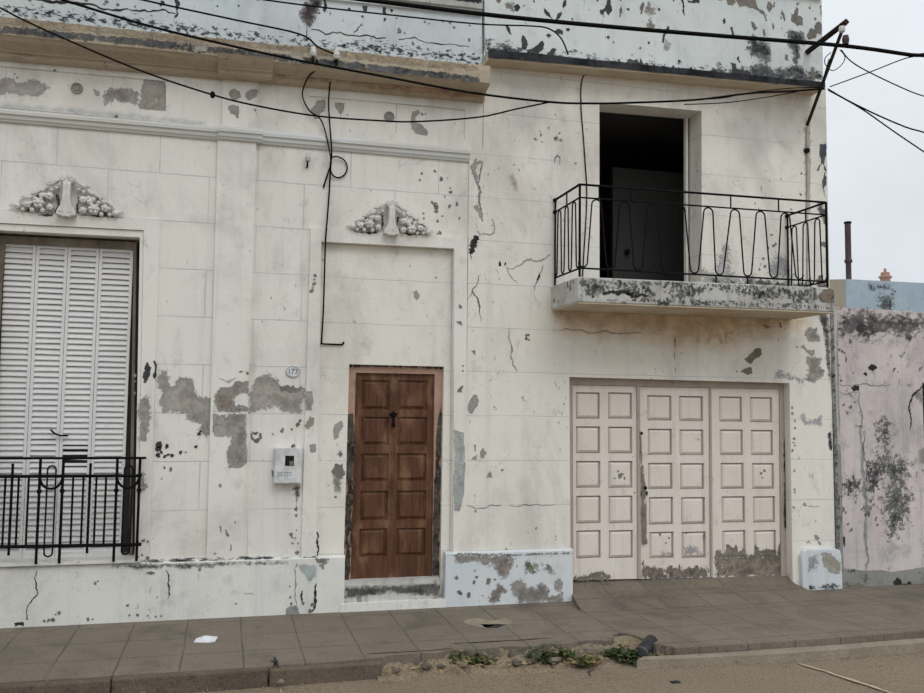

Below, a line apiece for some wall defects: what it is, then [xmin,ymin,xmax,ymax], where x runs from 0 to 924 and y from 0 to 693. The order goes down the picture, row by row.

peeling [721,0,822,80]
peeling [93,80,166,111]
crack [468,158,495,318]
crack [507,254,551,290]
crack [908,386,923,430]
peeling [431,405,442,576]
peeling [453,429,486,511]
crack [467,502,546,510]
crack [840,383,890,570]
crack [26,571,38,618]
spalling [454,547,611,605]
peeling [641,533,780,580]